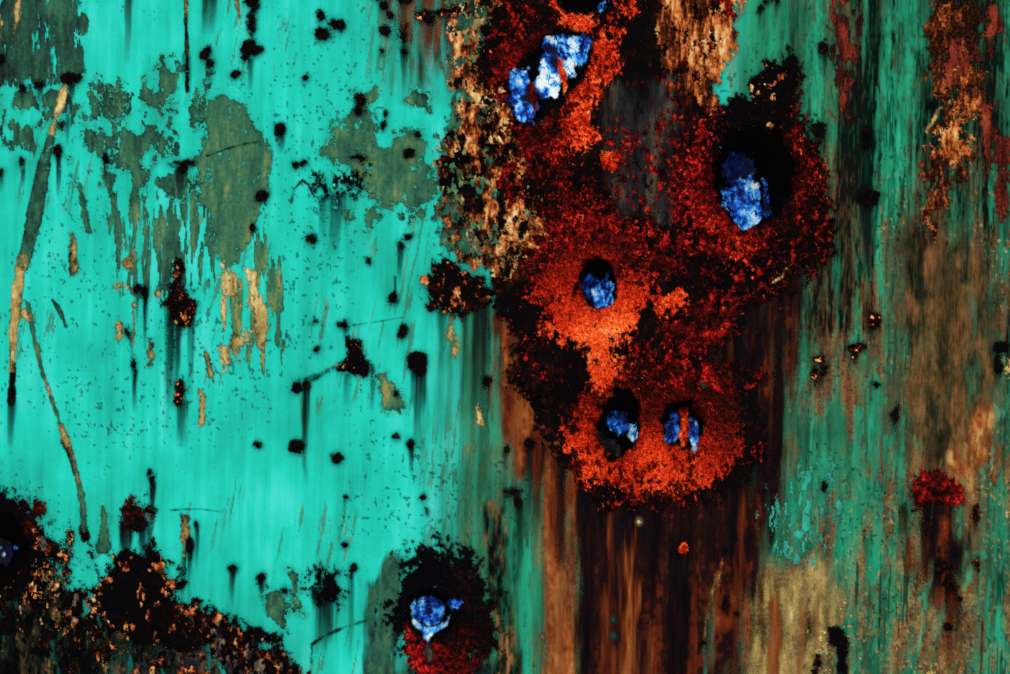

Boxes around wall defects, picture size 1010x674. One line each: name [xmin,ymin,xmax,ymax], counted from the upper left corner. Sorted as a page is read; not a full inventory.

corrosion [52,144,63,181]
corrosion [60,72,83,103]
peeling [0,0,291,382]
peeling [316,0,501,274]
corrosion [133,283,149,329]
corrosion [160,256,200,426]
peeling [197,388,207,427]
corrosion [336,319,374,384]
corrosion [363,0,850,674]
corrosion [890,0,1010,631]
corrosion [0,468,311,674]
corrosion [300,562,358,636]